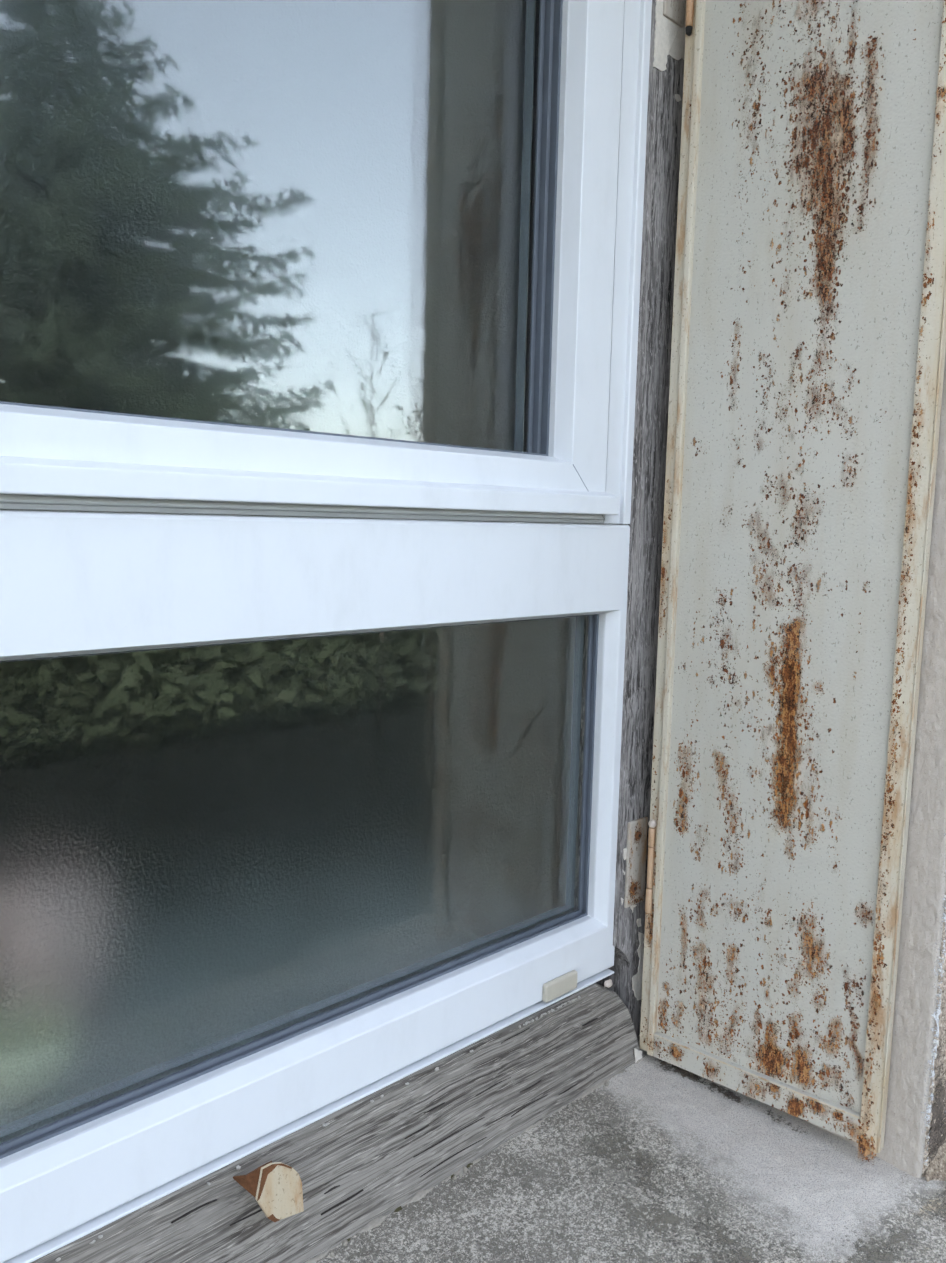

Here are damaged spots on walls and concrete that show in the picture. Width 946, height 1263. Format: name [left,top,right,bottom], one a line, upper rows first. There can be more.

rust [628,0,937,1165]
rust [933,54,946,164]